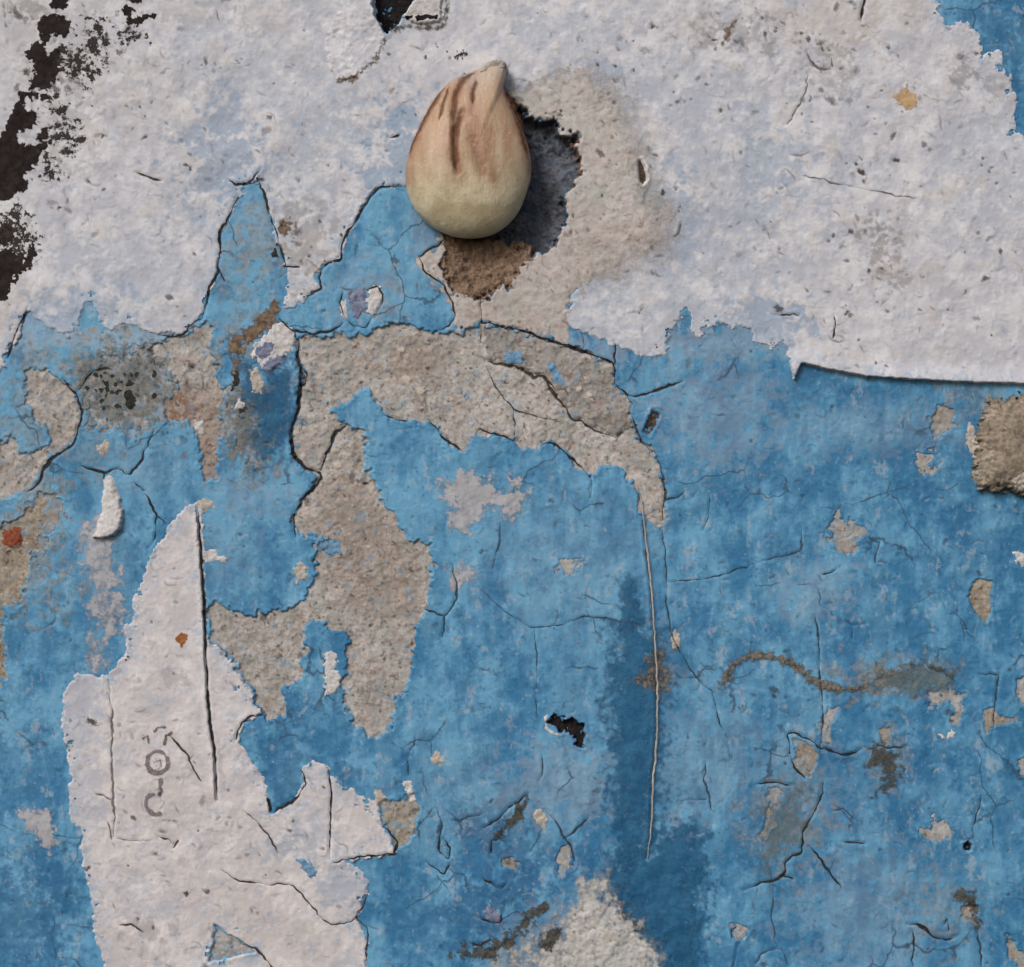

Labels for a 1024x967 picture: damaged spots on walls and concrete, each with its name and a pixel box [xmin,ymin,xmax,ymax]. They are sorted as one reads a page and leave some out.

peeling [324,0,385,82]
peeling [404,0,443,25]
leakage [0,0,157,301]
crack [161,167,402,537]
crack [419,240,455,331]
crack [26,367,165,543]
peeling [0,68,676,967]
crack [171,505,260,799]
crack [95,689,179,848]
crack [244,768,398,863]
crack [731,619,902,967]
crack [221,869,369,967]